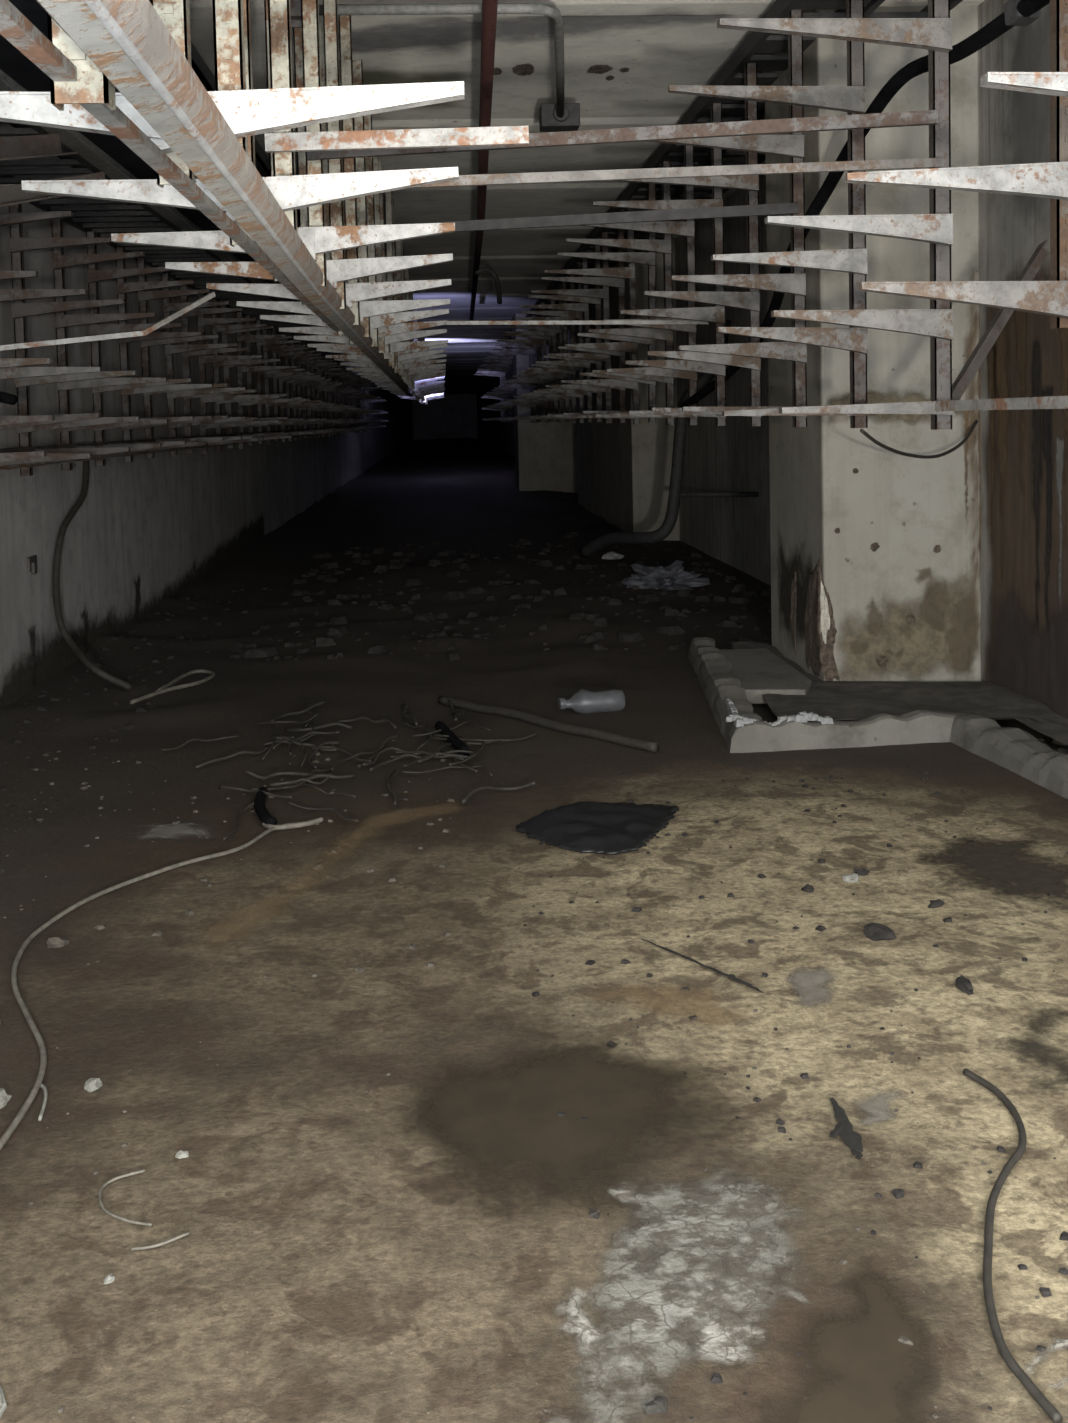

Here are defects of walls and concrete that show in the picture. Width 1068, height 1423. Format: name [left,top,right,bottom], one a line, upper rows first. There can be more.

damp [779,545,812,638]
damp [840,569,978,679]
damp [415,1044,806,1423]
damp [770,1275,929,1423]